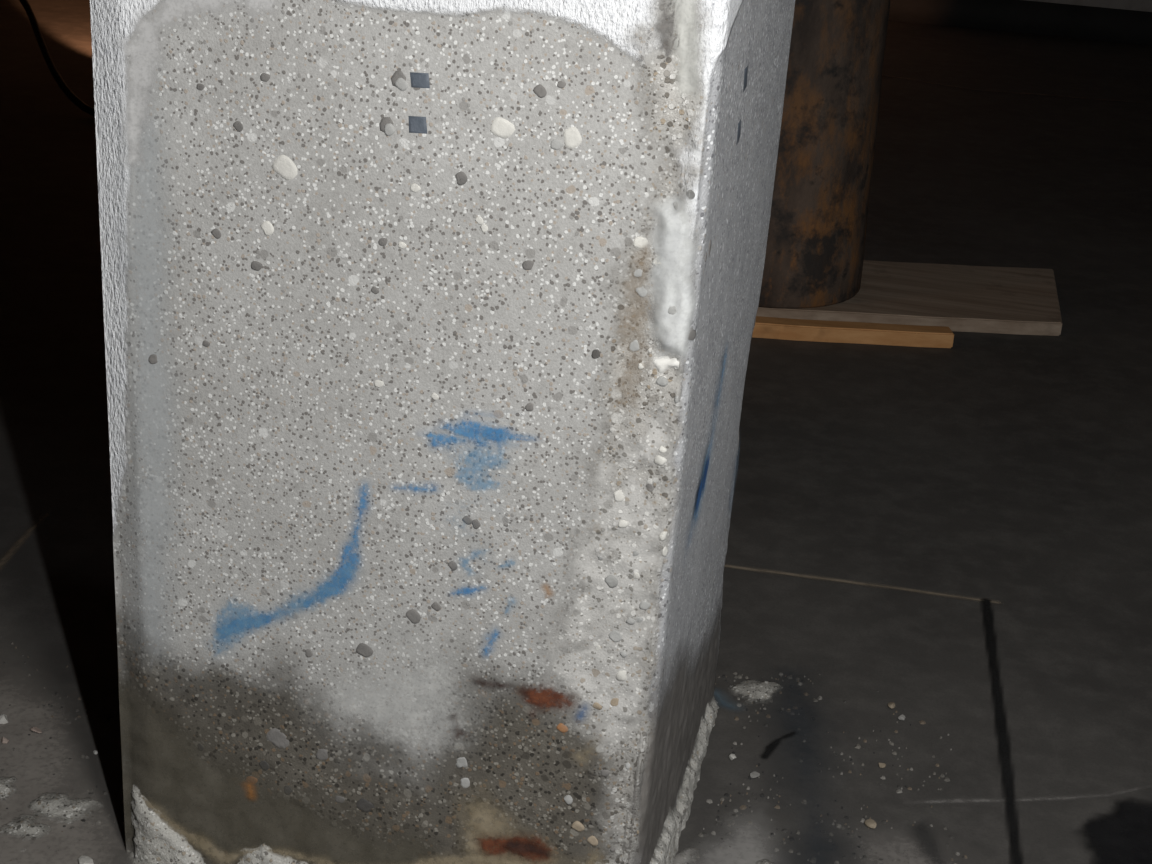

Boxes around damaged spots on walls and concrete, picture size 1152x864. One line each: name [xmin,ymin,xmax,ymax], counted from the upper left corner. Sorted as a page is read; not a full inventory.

peeling [113,0,795,864]
damp [117,611,720,864]
corrosion [466,802,555,864]
corrosion [520,688,572,708]